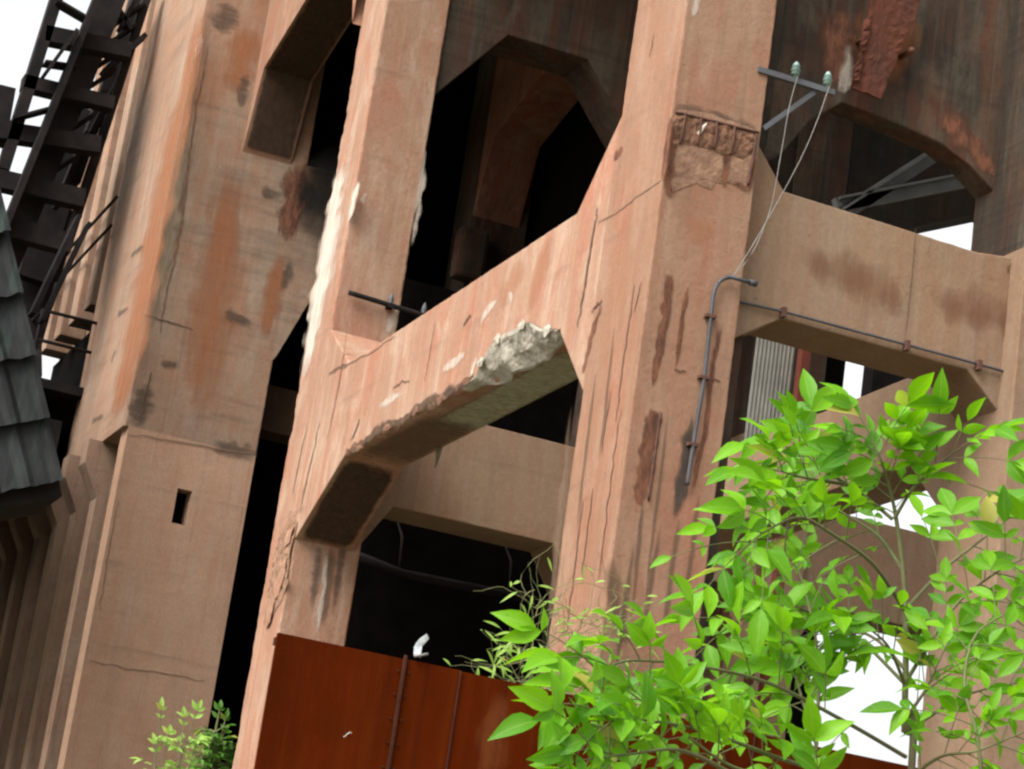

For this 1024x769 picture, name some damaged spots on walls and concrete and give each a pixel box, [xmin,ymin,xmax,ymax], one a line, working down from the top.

spalling [661,109,759,196]
corrosion [942,114,996,175]
corrosion [278,169,305,238]
crack [577,180,660,323]
crack [145,315,192,330]
corrosion [652,276,688,384]
spalling [351,319,565,453]
corrosion [634,410,662,504]
leakage [305,463,391,546]
leakage [318,557,333,622]
crack [89,660,205,681]